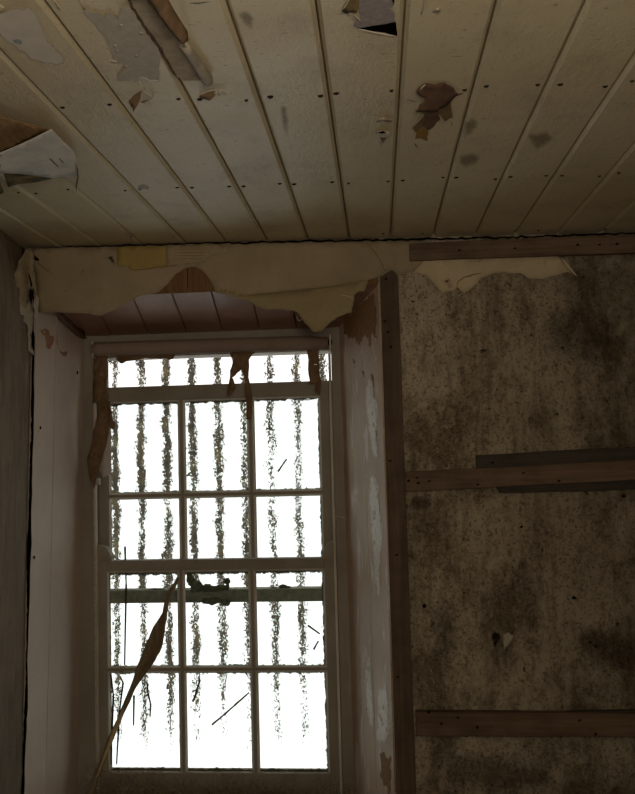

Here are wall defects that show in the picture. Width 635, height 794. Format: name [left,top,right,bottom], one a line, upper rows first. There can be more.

peeling [0,4,64,65]
peeling [83,0,227,112]
peeling [408,82,463,147]
peeling [343,294,376,347]
peeling [353,359,378,457]
peeling [369,475,383,598]
peeling [364,650,392,794]